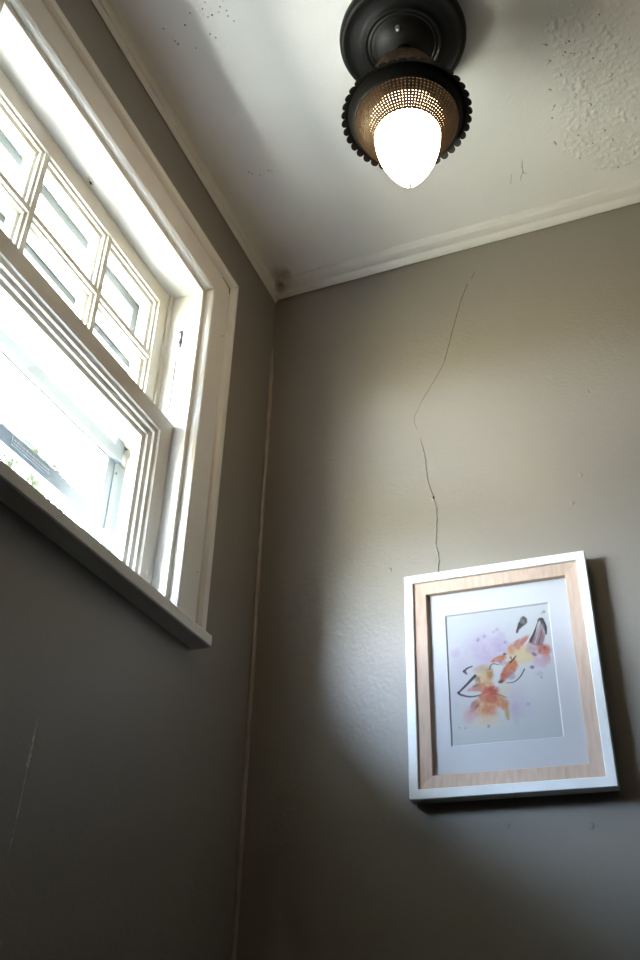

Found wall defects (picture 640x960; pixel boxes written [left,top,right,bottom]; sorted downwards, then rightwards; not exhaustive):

crack [414,272,475,572]